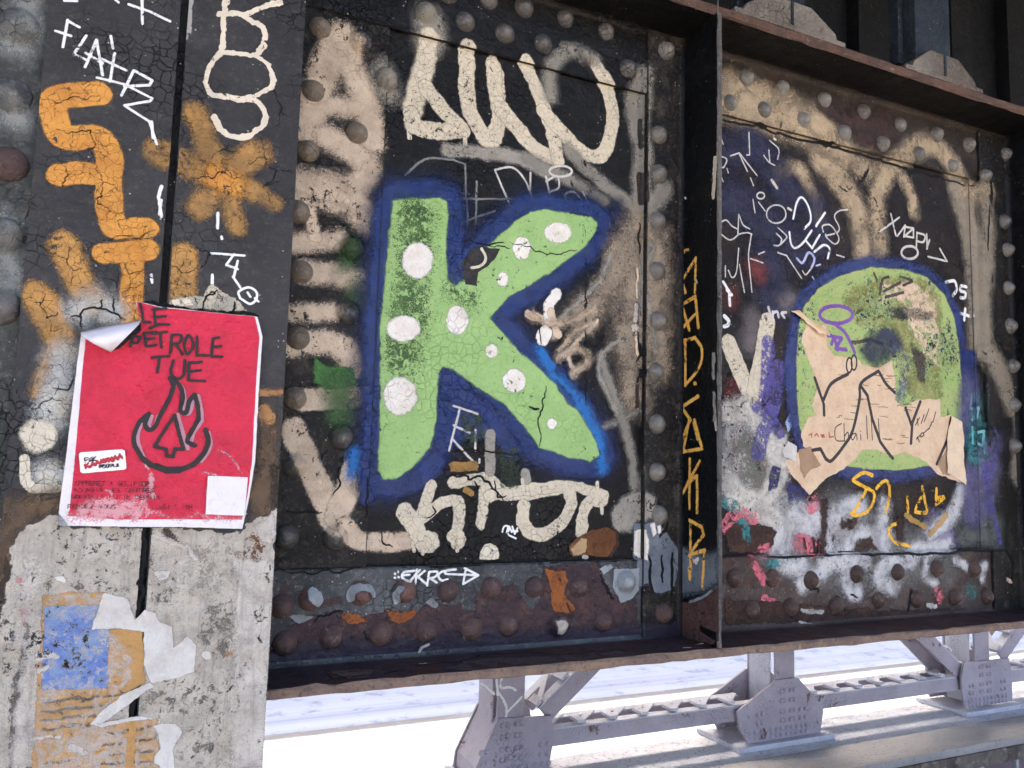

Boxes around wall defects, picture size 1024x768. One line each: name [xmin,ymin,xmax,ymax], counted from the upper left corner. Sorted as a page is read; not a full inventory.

crack [53,91,156,241]
crack [30,247,259,332]
crack [490,243,589,405]
crack [286,450,341,514]
crack [274,476,638,575]
crack [447,386,547,500]
peeling [0,509,277,768]
corrosion [423,650,634,671]
corrosion [545,568,576,613]
peeling [284,521,1012,653]